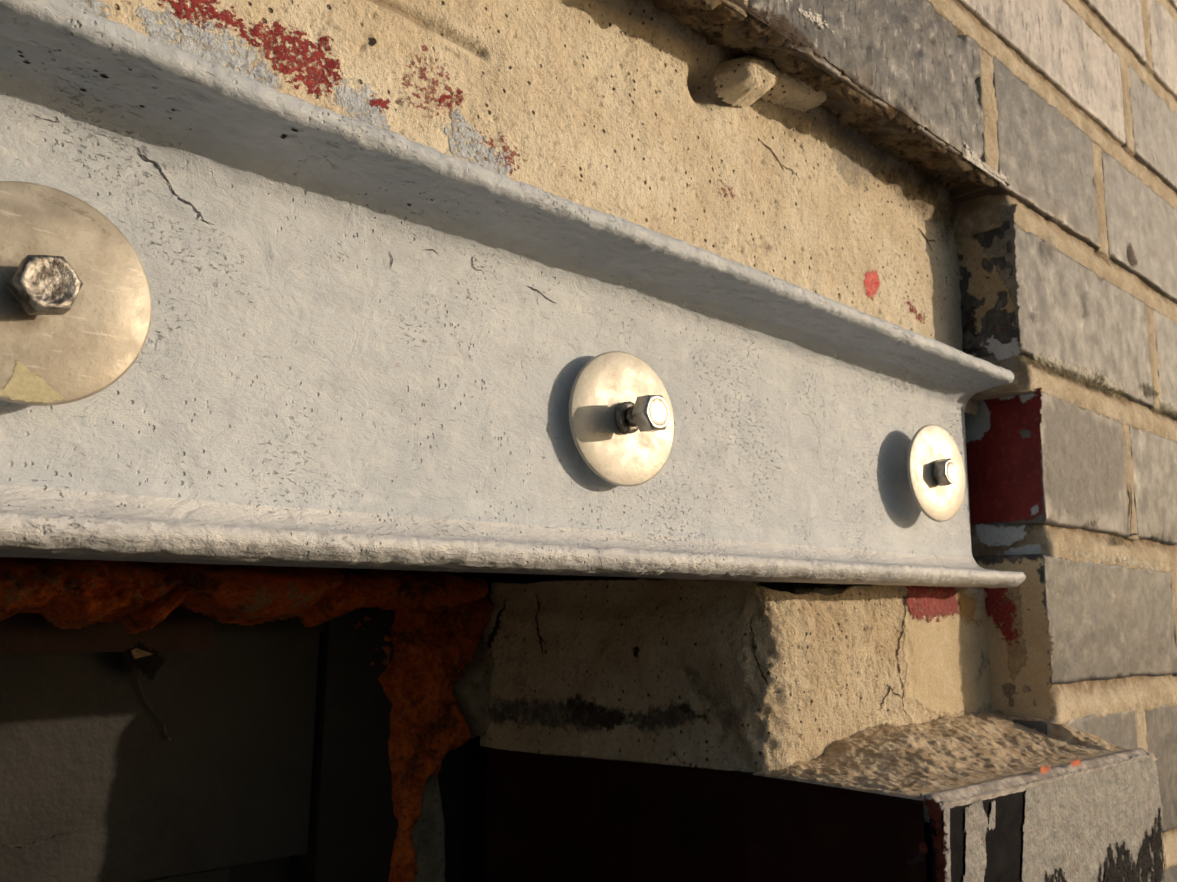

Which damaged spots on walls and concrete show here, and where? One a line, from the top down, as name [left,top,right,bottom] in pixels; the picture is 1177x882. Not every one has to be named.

peeling [157,0,346,97]
peeling [369,45,528,177]
crack [137,148,214,225]
peeling [964,392,1042,443]
peeling [1003,542,1050,567]
crack [487,600,506,648]
crack [880,596,909,721]
water stain [488,694,710,732]
peeling [963,799,996,882]
peeling [1022,752,1167,882]